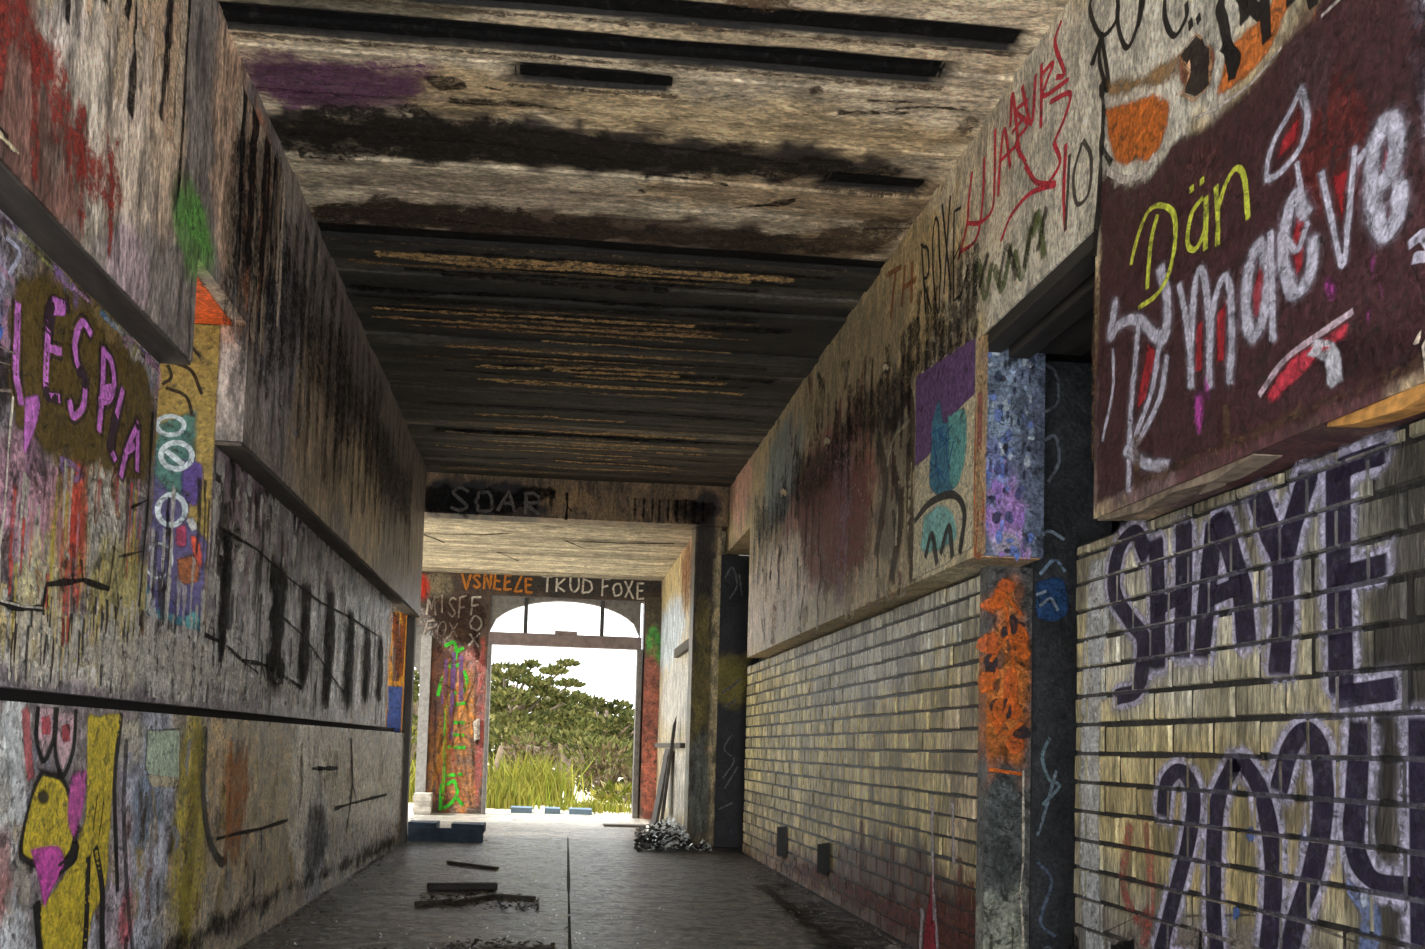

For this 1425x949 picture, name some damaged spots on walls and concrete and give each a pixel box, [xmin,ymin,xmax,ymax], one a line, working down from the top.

leakage [223,49,912,576]
leakage [753,242,979,593]